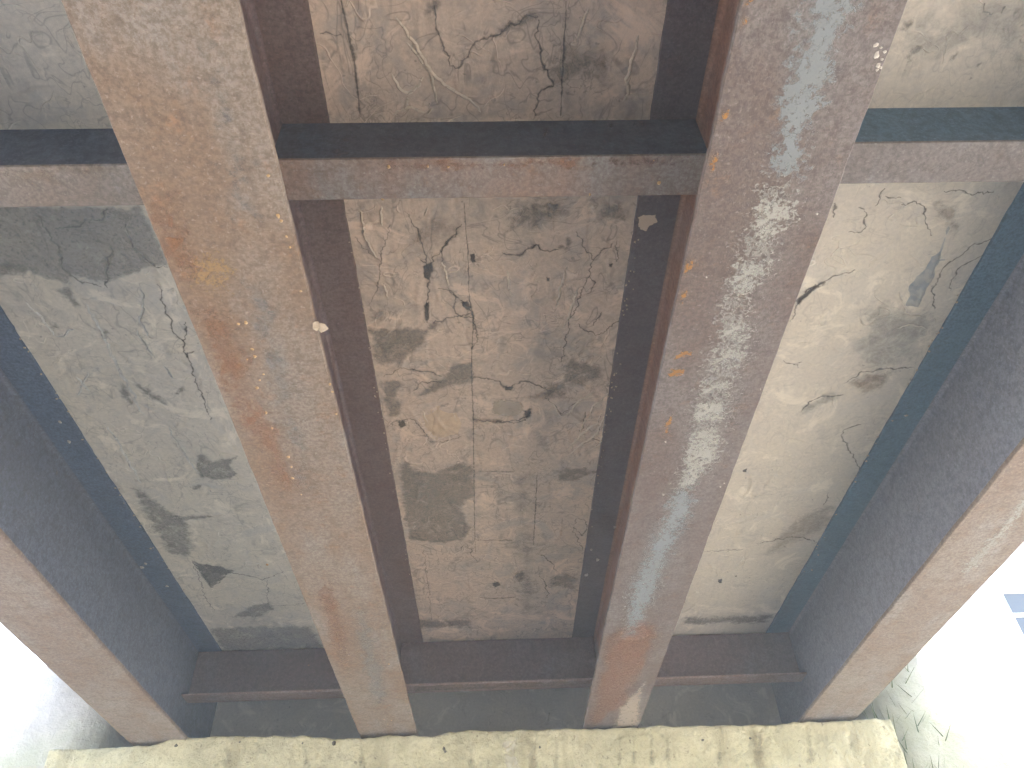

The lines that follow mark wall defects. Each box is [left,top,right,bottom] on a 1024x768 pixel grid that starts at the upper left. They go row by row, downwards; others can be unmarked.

crack [320,0,361,115]
crack [435,11,566,116]
crack [35,210,212,420]
crack [503,235,619,362]
spalling [638,215,658,231]
crack [789,270,854,322]
crack [833,188,991,236]
crack [931,239,990,307]
crack [357,205,599,596]
damp [401,464,474,543]